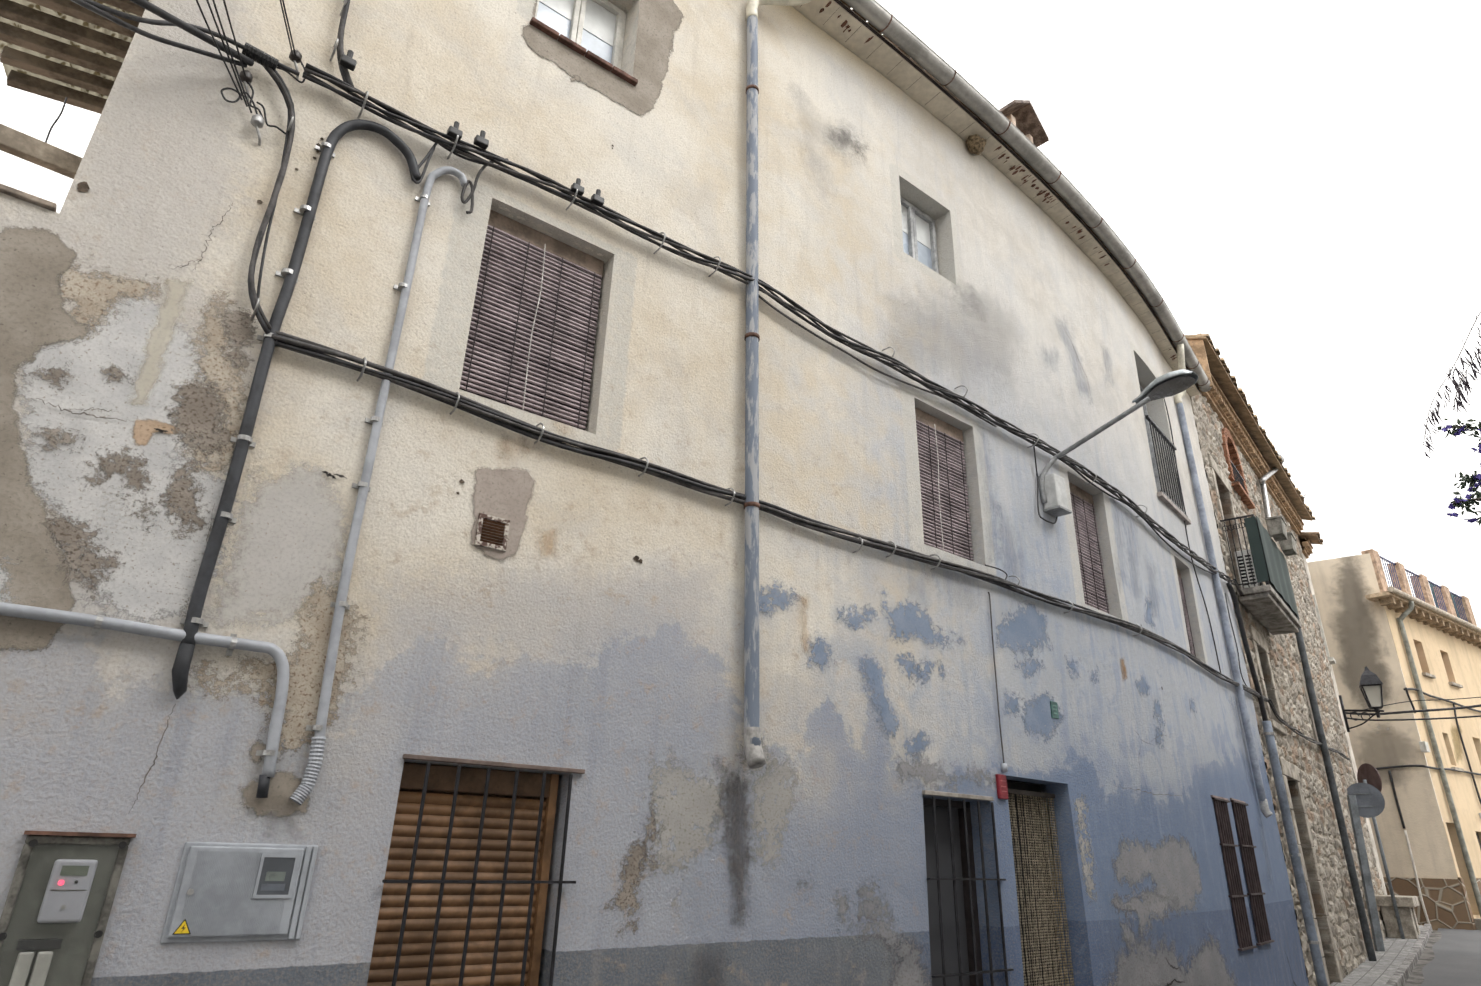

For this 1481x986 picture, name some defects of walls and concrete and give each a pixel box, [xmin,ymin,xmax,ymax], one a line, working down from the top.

peeling [16,259,369,763]
crack [130,704,176,810]
peeling [759,580,801,616]
peeling [809,637,832,671]
peeling [837,591,996,791]
peeling [1005,691,1063,742]
peeling [996,603,1099,682]
damp [1339,564,1387,705]
peeling [604,749,725,937]
damp [714,770,750,921]
peeling [1074,796,1236,986]